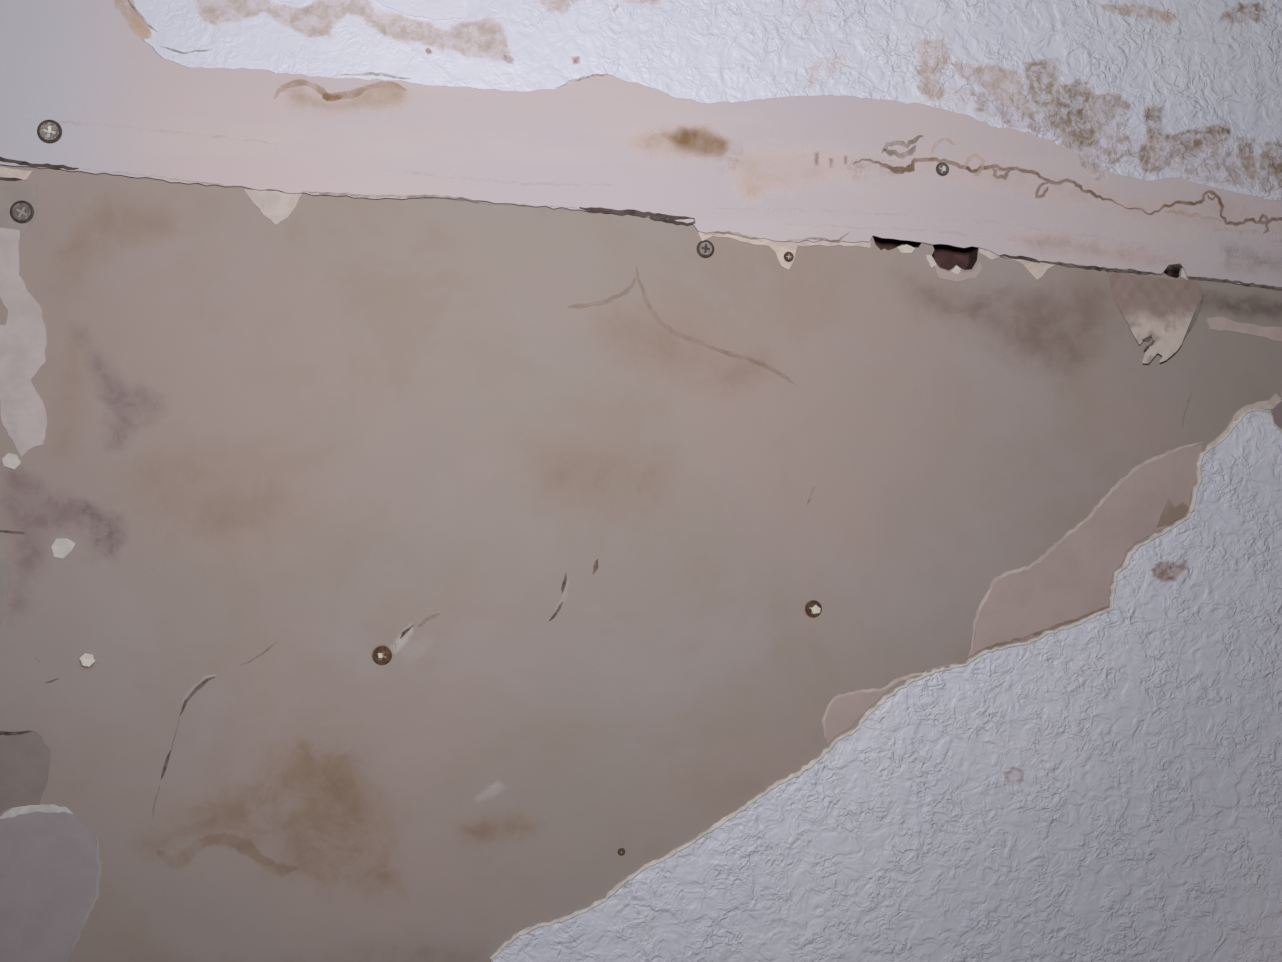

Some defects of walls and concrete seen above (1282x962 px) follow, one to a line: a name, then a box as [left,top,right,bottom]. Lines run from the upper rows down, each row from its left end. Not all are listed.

damp [197,0,512,62]
damp [541,0,573,13]
damp [917,39,1282,199]
spalling [874,237,921,253]
spalling [926,244,978,274]
peeling [0,228,47,457]
peeling [1108,273,1201,363]
peeling [0,731,50,817]
crack [159,677,214,788]
damp [204,750,358,873]
peeling [489,393,1282,962]
peeling [0,805,100,962]